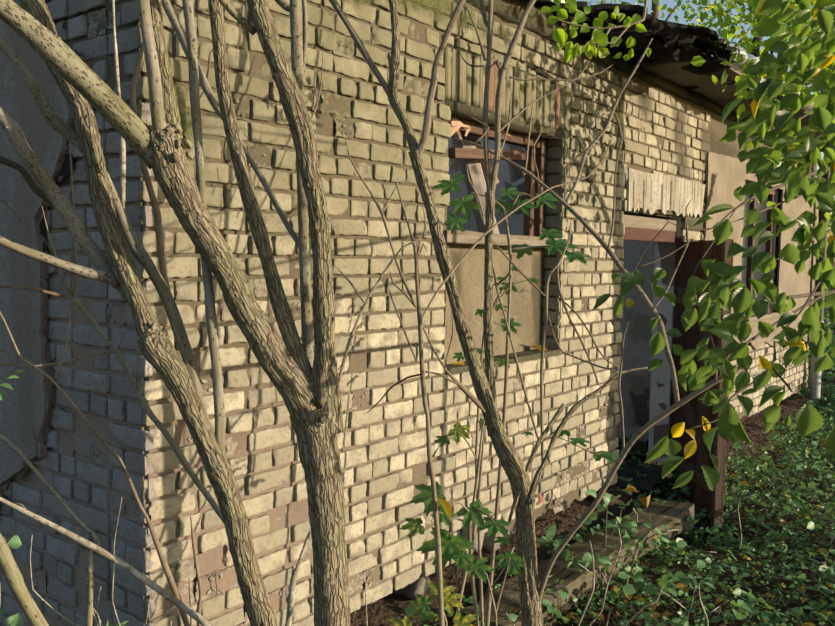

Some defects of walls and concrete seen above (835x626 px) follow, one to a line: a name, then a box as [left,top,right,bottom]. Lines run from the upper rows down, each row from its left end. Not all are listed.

peeling [657,236,685,286]
peeling [629,381,669,447]
spalling [127,495,152,523]